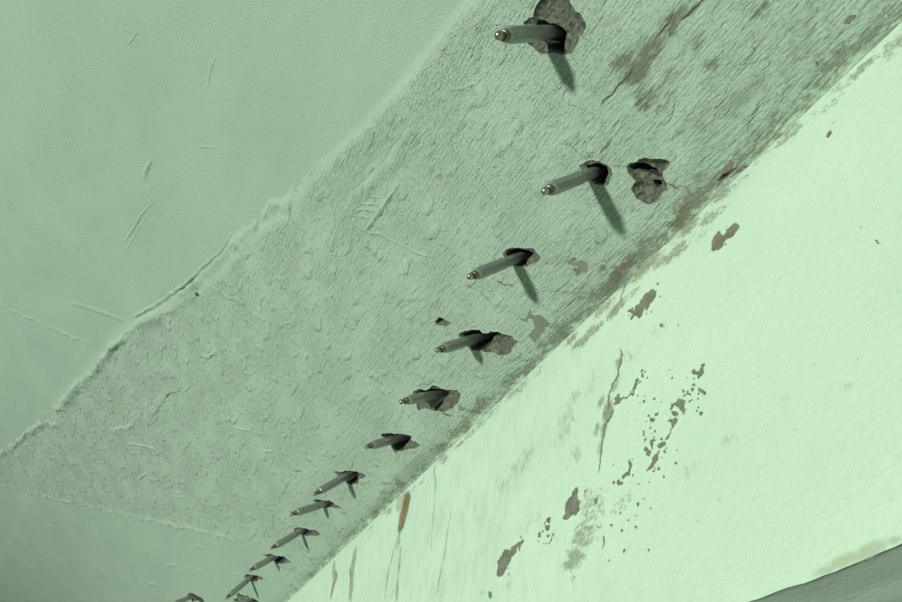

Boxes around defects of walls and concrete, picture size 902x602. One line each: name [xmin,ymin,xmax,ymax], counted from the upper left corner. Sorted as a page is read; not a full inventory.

spalling [523,0,588,57]
crack [654,0,703,38]
water stain [814,15,902,88]
crack [566,67,633,114]
spalling [625,156,671,206]
peeling [710,221,742,253]
water stain [430,94,811,464]
peeling [626,282,661,322]
spalling [434,308,552,357]
crack [598,350,622,472]
peeling [612,363,706,485]
peeling [496,537,526,579]